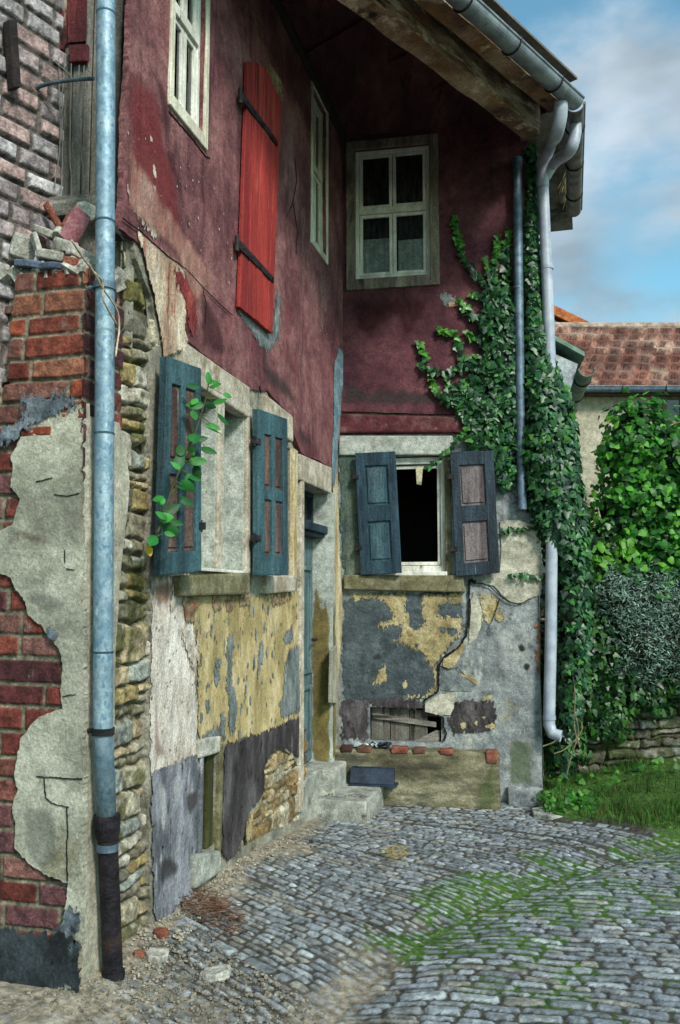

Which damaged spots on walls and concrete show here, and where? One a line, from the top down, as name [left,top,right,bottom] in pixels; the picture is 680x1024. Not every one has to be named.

peeling [127,184,198,356]
spalling [0,388,80,530]
peeling [331,348,466,741]
spalling [0,574,82,945]
crack [36,776,83,881]
peeling [156,583,300,744]
peeling [448,695,497,736]
crack [422,578,530,742]